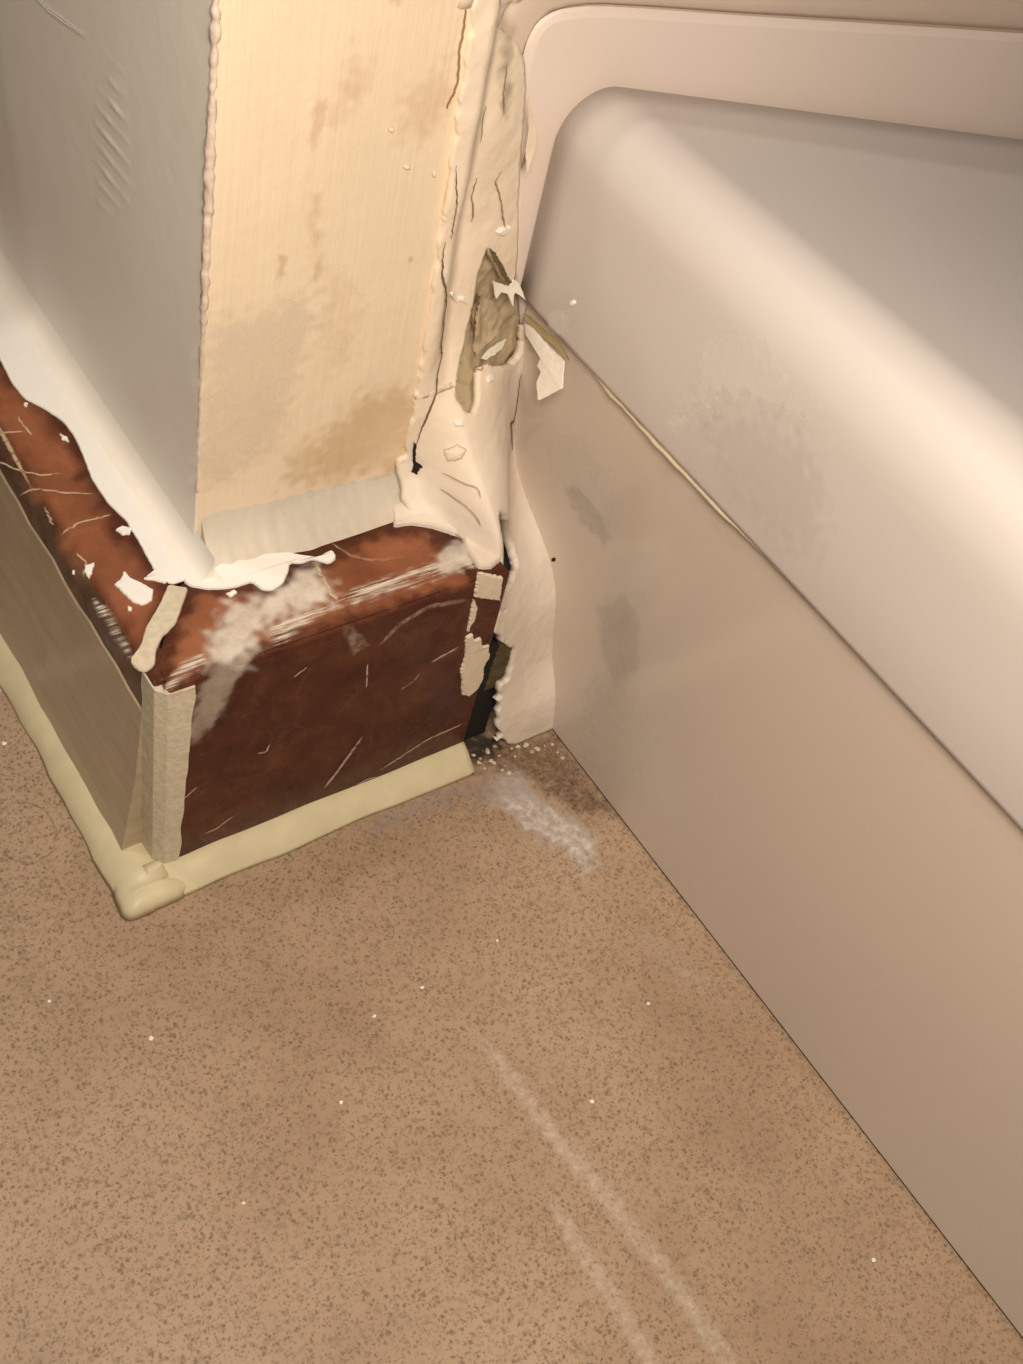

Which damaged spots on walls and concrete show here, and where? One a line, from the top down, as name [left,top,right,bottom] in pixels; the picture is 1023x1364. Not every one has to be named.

crack [446,9,467,109]
crack [481,66,507,140]
crack [411,165,512,526]
peeling [450,254,569,427]
peeling [460,599,490,696]